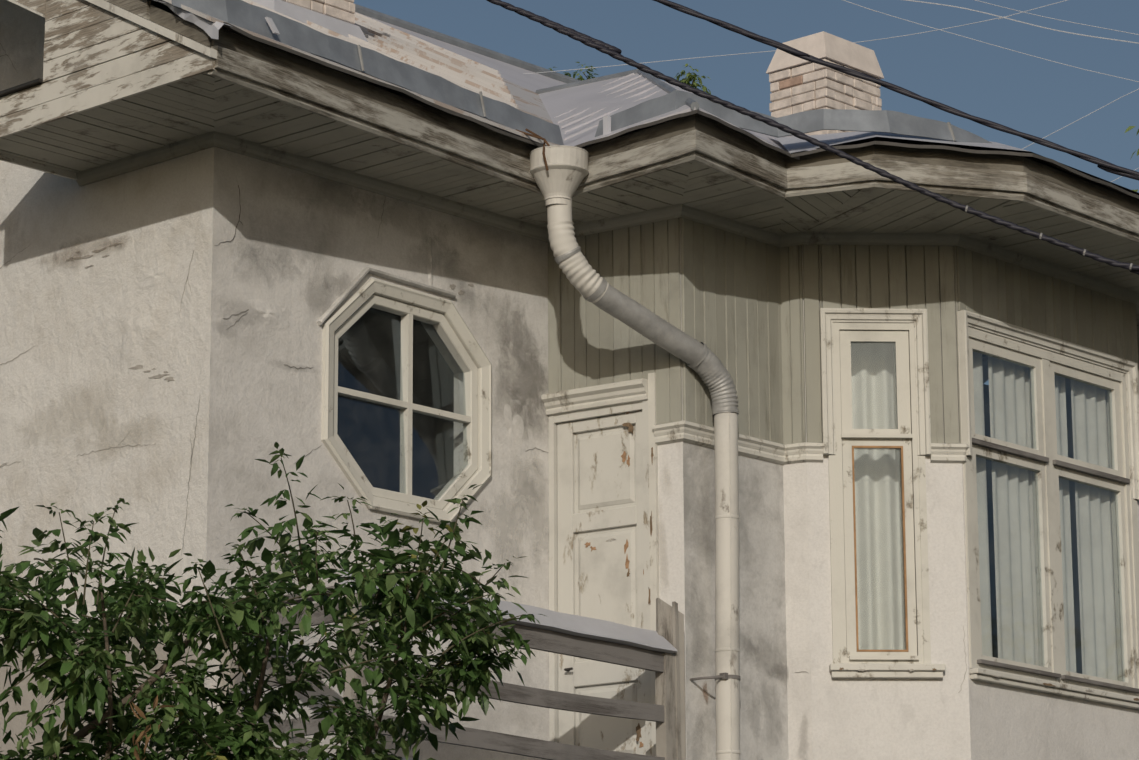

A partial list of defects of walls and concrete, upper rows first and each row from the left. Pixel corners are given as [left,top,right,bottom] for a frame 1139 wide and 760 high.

spalling [66,243,123,268]
crack [180,185,243,311]
crack [181,399,200,551]